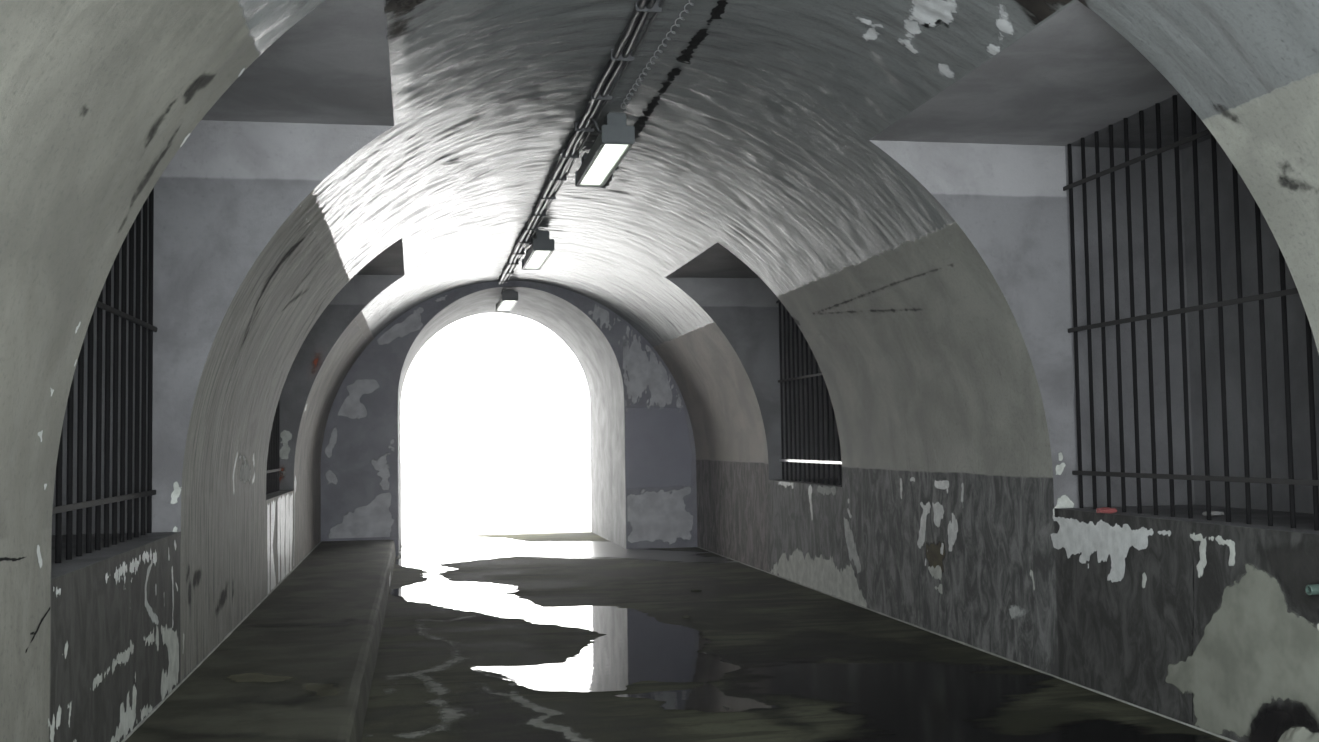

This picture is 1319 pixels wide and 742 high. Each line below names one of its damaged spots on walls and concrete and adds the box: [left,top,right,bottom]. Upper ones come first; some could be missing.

peeling [1055,452,1066,475]
peeling [627,485,693,545]
peeling [917,502,958,594]
peeling [1051,495,1171,583]
peeling [90,526,184,742]
spalling [1165,533,1319,738]
peeling [48,702,77,742]